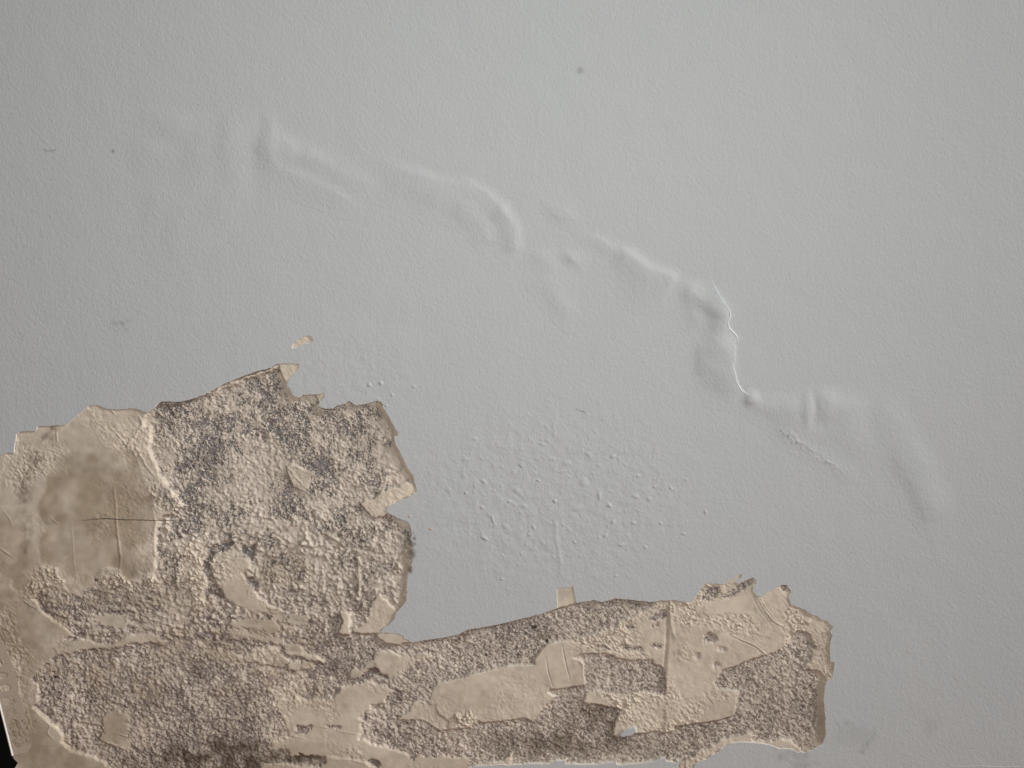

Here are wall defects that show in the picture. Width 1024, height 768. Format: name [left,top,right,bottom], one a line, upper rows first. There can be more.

flaking render [0,363,835,768]